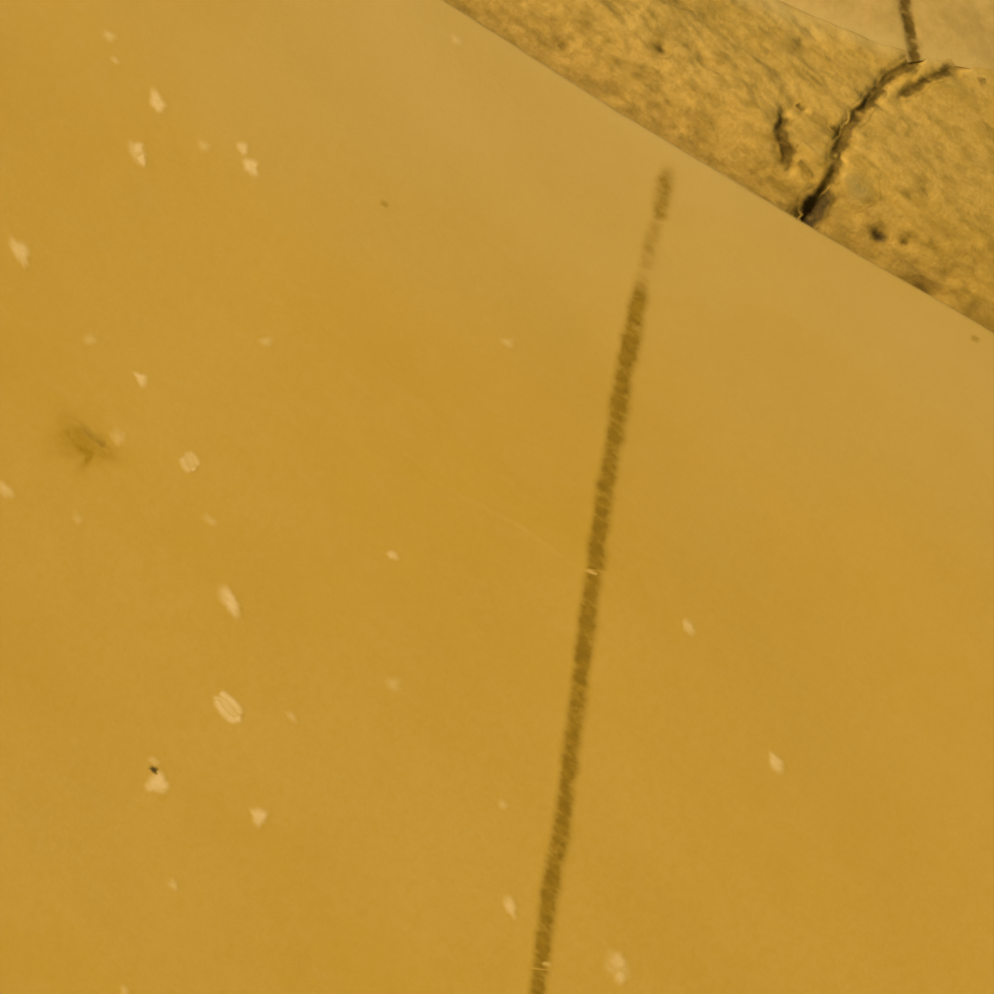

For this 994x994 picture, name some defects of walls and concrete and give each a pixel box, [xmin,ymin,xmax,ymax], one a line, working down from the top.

peeling [147,83,170,116]
crack [770,0,986,235]
peeling [124,134,149,170]
peeling [235,139,262,180]
crack [524,157,679,994]
peeling [214,580,243,624]
peeling [211,689,245,725]
peeling [142,754,172,797]